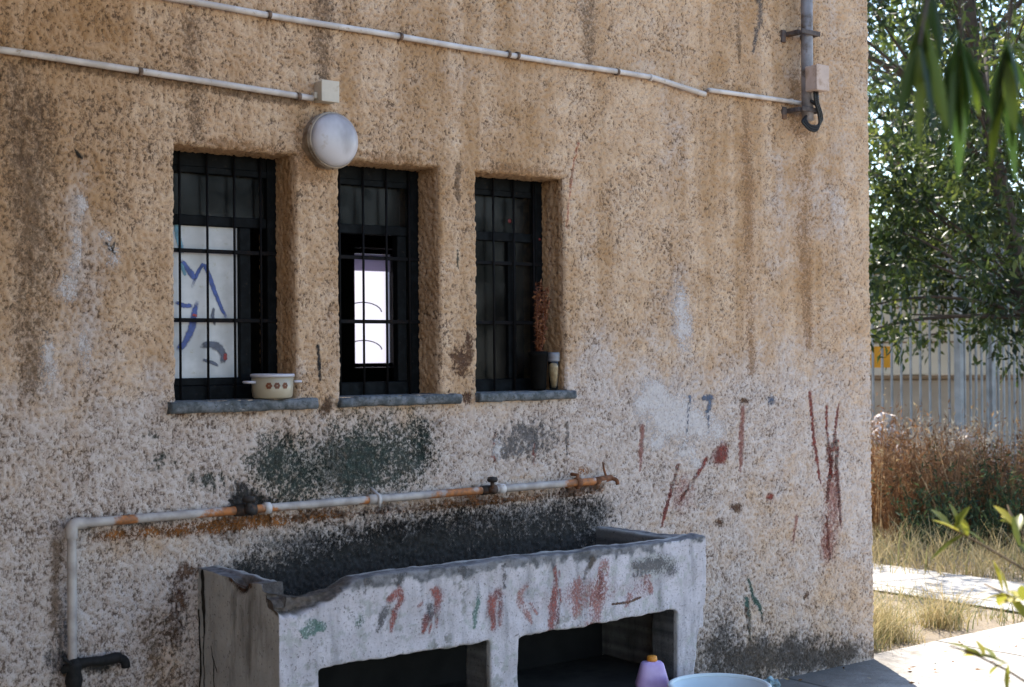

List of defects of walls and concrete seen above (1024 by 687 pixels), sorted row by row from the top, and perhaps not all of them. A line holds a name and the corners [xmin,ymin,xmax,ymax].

damp [188,396,444,503]
rust [93,466,604,544]
damp [221,493,616,595]